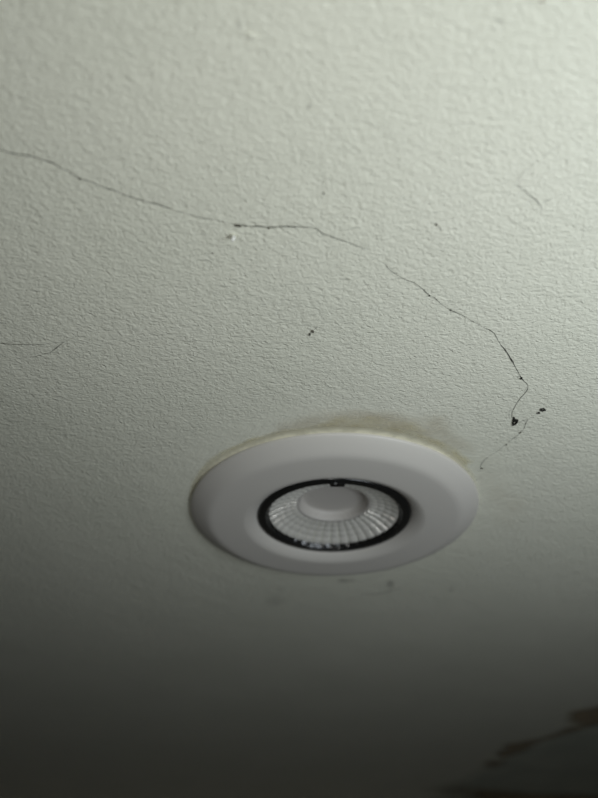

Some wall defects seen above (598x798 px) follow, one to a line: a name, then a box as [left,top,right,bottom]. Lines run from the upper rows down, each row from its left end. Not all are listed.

crack [386,265,528,445]